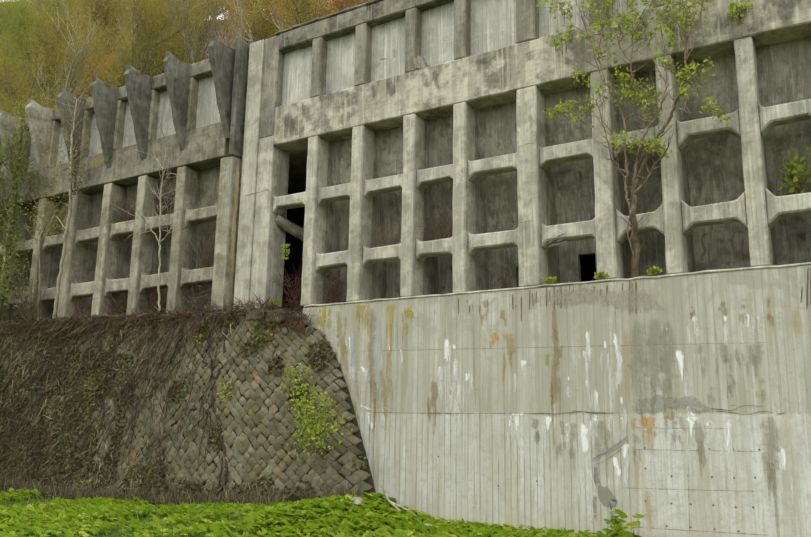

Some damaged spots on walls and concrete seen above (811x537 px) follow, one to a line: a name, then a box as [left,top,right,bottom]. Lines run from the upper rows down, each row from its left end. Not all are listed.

leakage [318,304,414,394]
leakage [543,416,556,438]
leakage [576,331,630,525]
corrosion [632,416,655,438]
leakage [674,350,715,475]